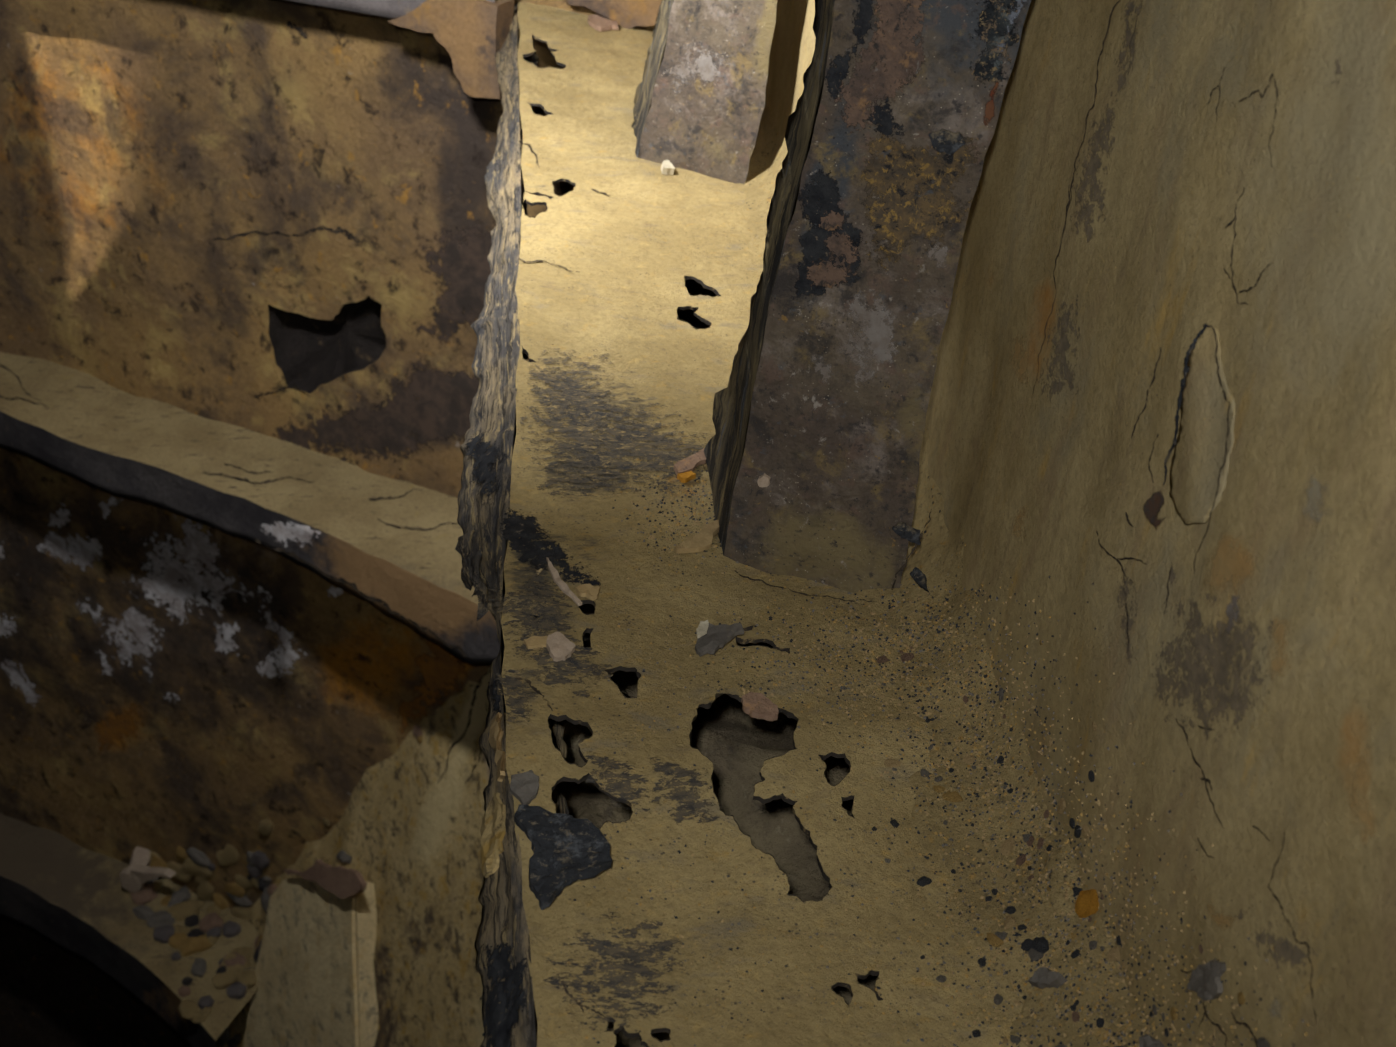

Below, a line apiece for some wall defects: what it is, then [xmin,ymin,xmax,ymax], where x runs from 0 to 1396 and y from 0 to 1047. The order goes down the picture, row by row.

crack [1207,67,1278,168]
crack [1033,0,1142,392]
crack [1224,187,1272,305]
spalling [268,296,386,394]
crack [1131,347,1161,483]
water stain [1,658,41,707]
water stain [36,503,103,572]
water stain [76,518,310,684]
water stain [260,521,321,548]
crack [1096,512,1172,655]
water stain [1152,568,1273,741]
crack [1176,718,1317,1022]